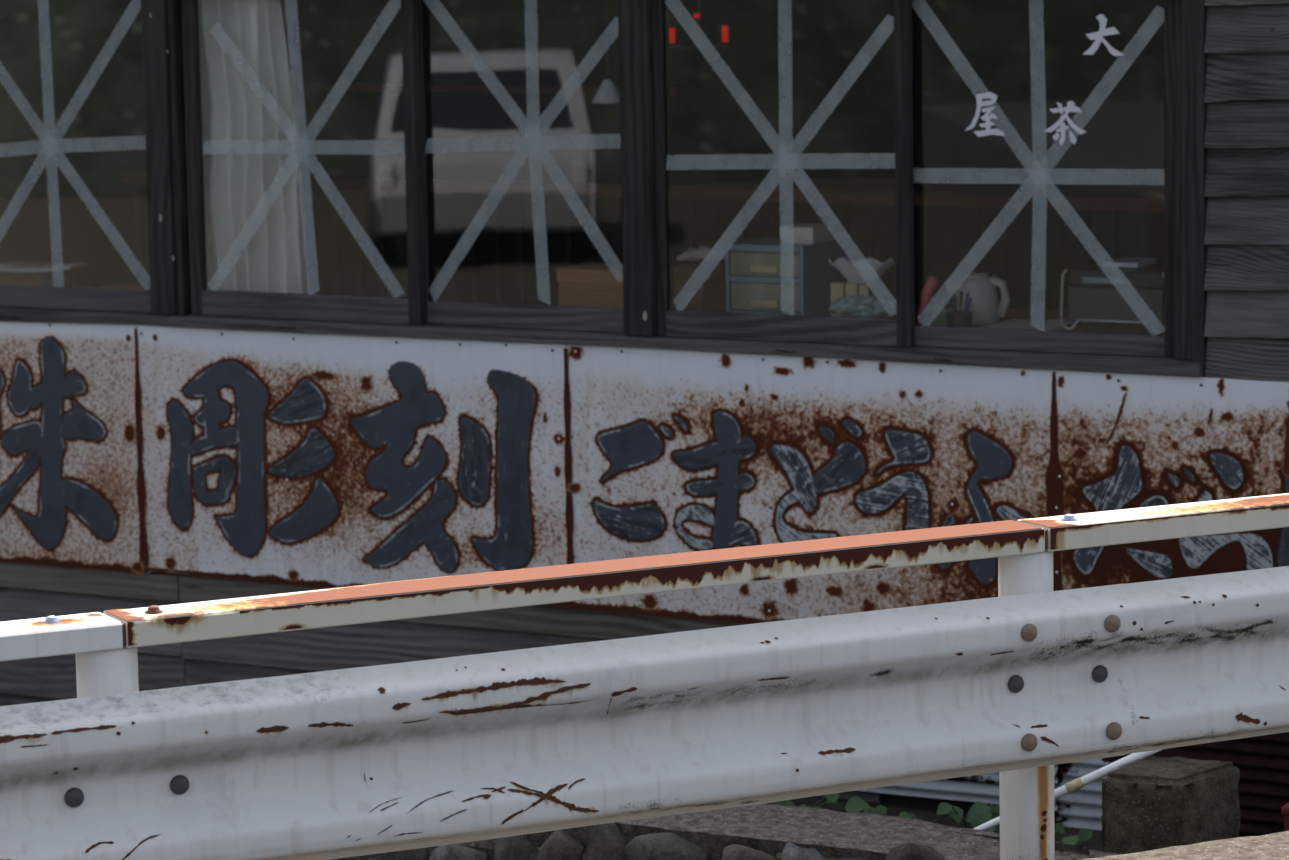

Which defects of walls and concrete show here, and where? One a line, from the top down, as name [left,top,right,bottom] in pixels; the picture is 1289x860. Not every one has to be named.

corrosion [0,328,1289,646]